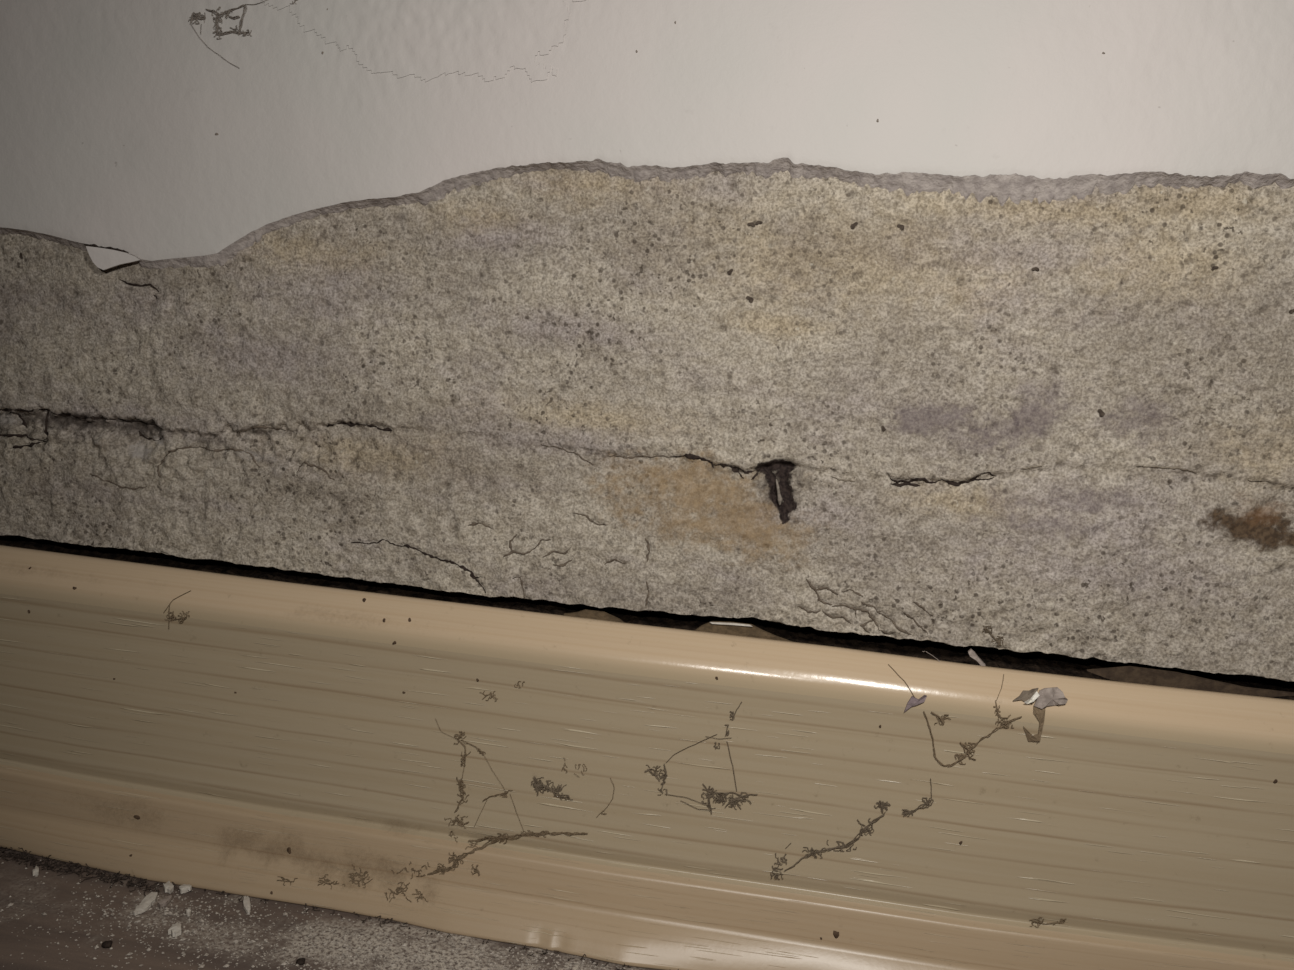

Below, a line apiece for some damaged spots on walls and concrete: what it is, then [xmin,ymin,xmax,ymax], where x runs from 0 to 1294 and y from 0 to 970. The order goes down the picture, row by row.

crack [327,422,393,432]
peeling [0,158,1294,682]
crack [0,408,286,490]
crack [296,461,335,480]
crack [887,465,1042,487]
crack [1142,465,1197,473]